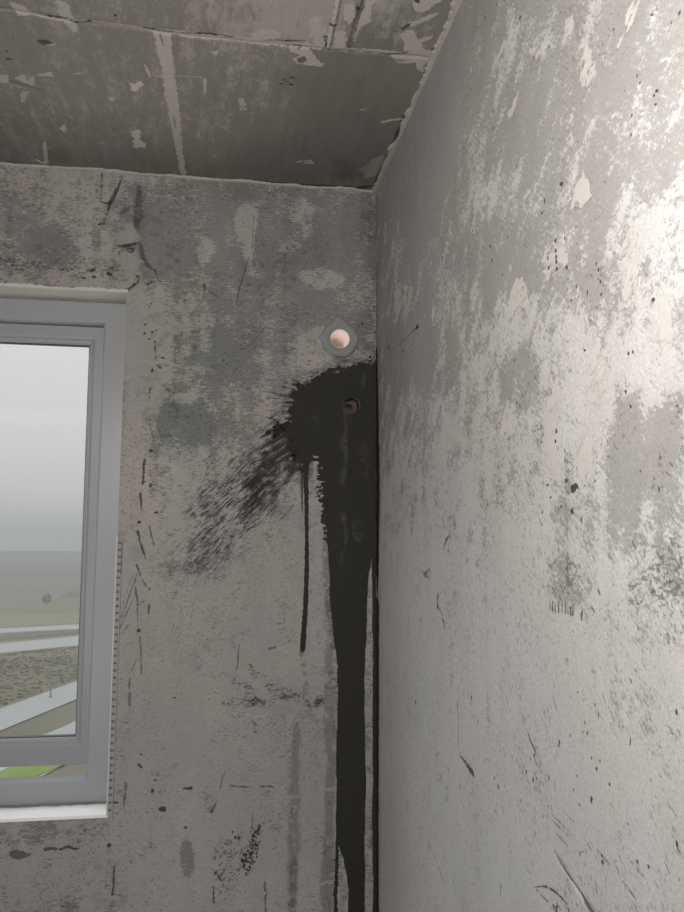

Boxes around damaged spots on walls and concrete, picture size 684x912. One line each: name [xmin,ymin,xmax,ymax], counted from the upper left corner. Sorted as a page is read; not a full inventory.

flaking render [288,44,324,67]
flaking render [390,0,442,72]
flaking render [0,71,54,103]
crack [98,173,121,226]
leakage [248,348,380,912]